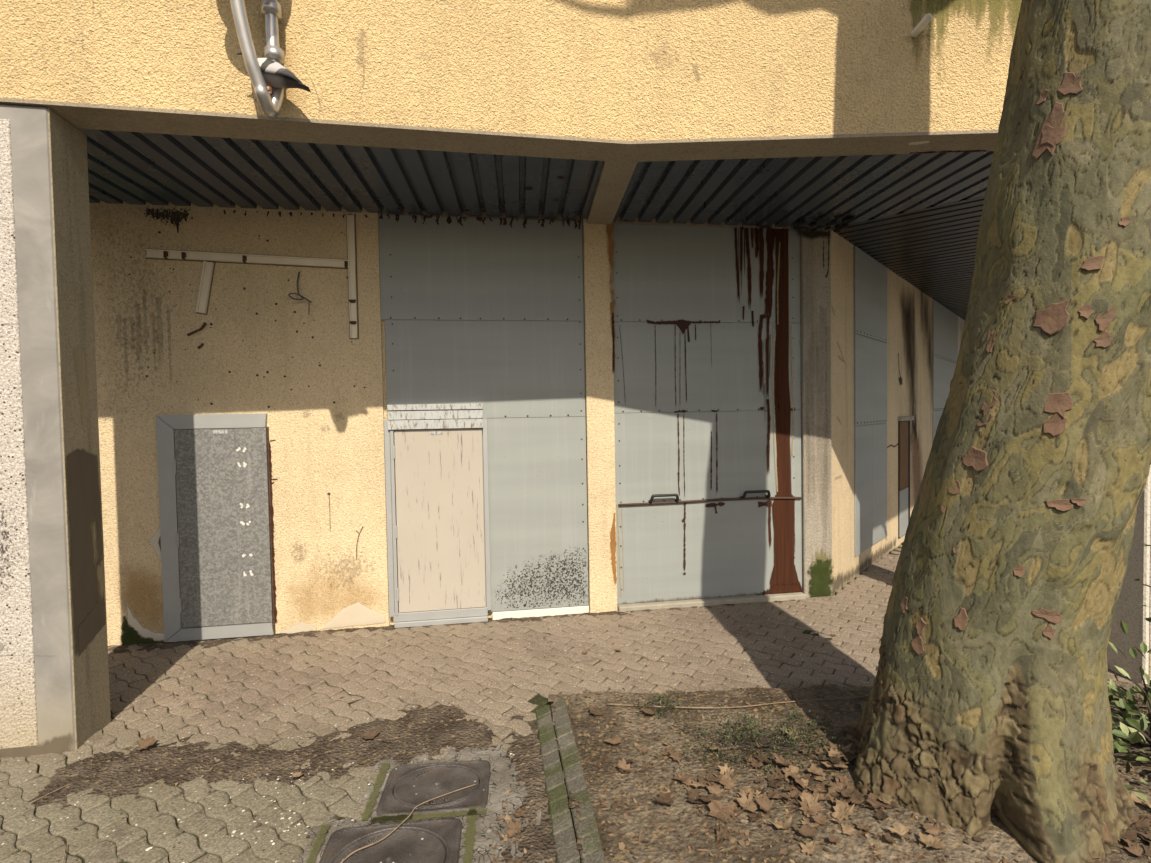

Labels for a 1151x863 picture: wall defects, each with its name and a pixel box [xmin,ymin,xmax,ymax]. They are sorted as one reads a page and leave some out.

corrosion [646,320,720,575]
corrosion [705,410,725,514]
corrosion [734,223,803,595]